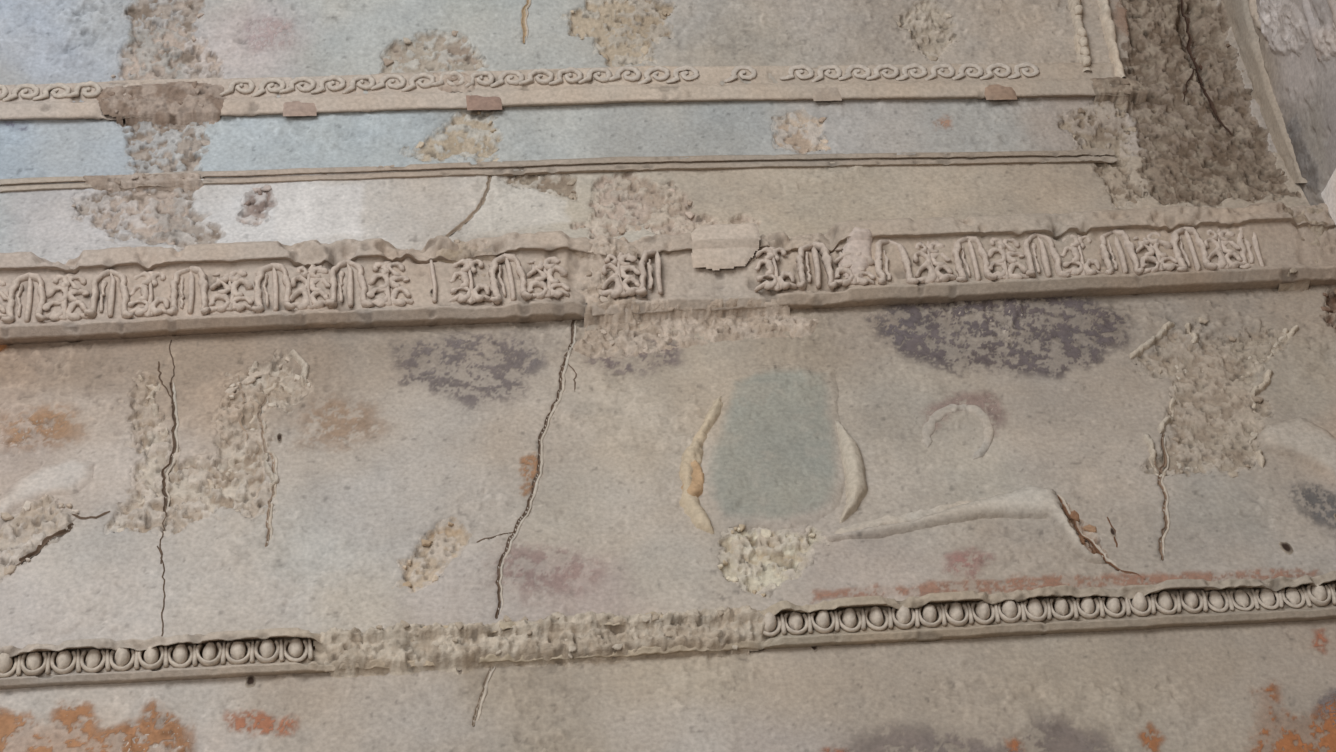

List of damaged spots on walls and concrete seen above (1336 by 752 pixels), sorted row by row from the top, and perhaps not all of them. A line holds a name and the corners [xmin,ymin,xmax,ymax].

flaking render [101,0,224,102]
crack [521,0,531,44]
flaking render [1057,0,1302,210]
crack [1180,0,1232,135]
flaking render [71,119,278,251]
water stain [401,336,540,404]
water stain [878,296,1126,376]
flaking render [0,494,79,583]
crack [157,340,179,636]
flaking render [104,349,315,538]
crack [477,320,578,618]
crack [1057,433,1170,580]